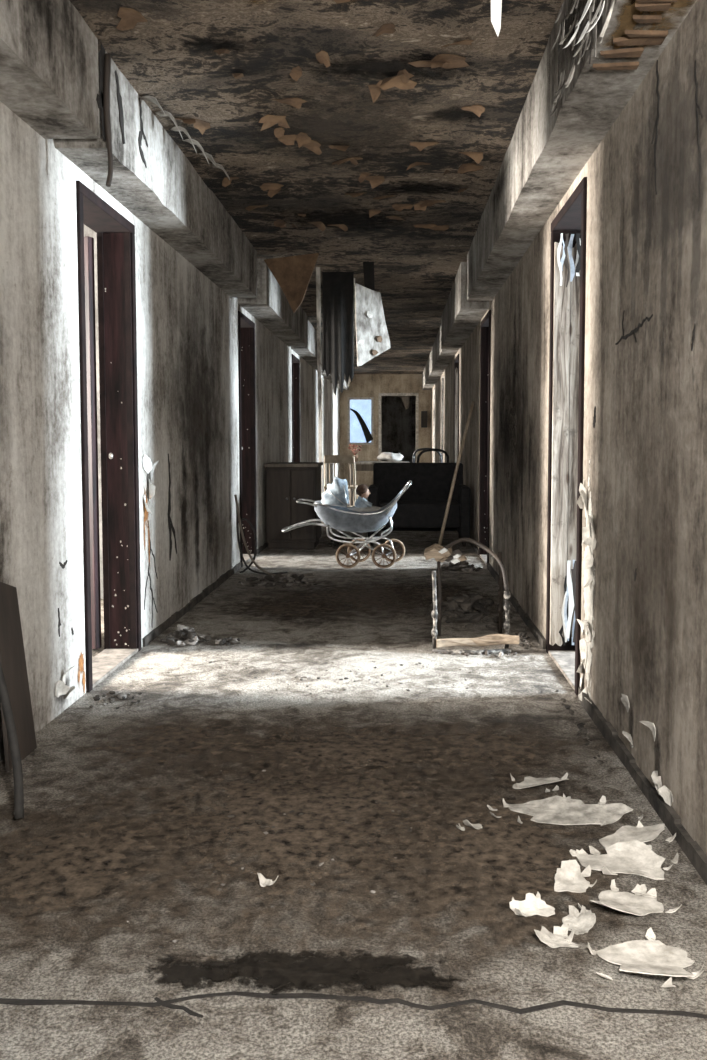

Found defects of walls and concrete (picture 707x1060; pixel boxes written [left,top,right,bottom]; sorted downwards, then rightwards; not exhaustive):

peeling [491,0,502,36]
damp [185,36,254,53]
damp [314,55,463,79]
damp [433,108,480,122]
peeling [140,96,239,187]
damp [391,182,456,194]
damp [279,204,407,230]
damp [177,331,222,570]